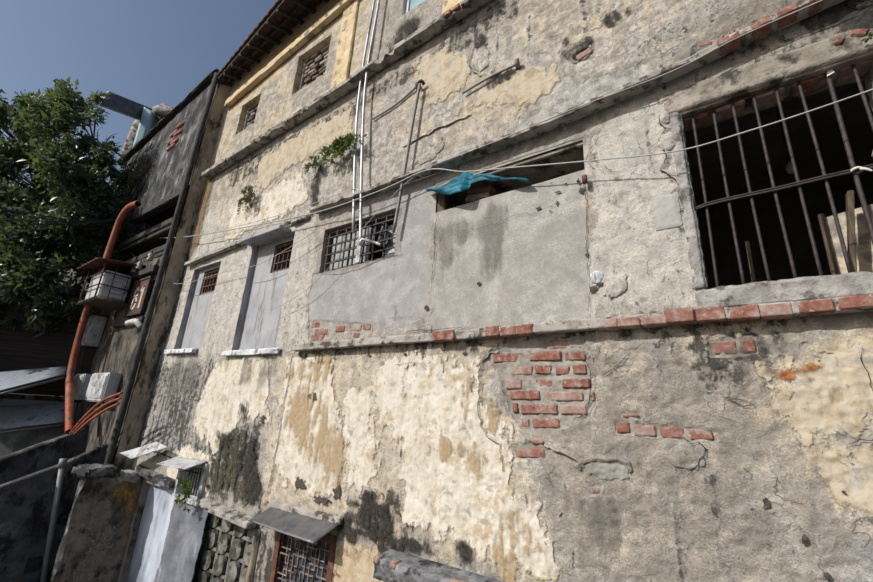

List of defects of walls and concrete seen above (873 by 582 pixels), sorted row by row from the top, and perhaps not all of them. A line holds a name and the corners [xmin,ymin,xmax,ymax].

leakage [385,12,419,69]
peeling [414,43,472,105]
peeling [454,63,561,115]
crack [583,108,681,310]
crack [429,204,564,294]
rust [777,363,822,381]
leakage [235,433,262,504]
peeling [165,320,599,582]
crack [673,436,713,476]
peeling [709,336,873,517]
leakage [336,490,431,555]
leakage [455,540,473,566]